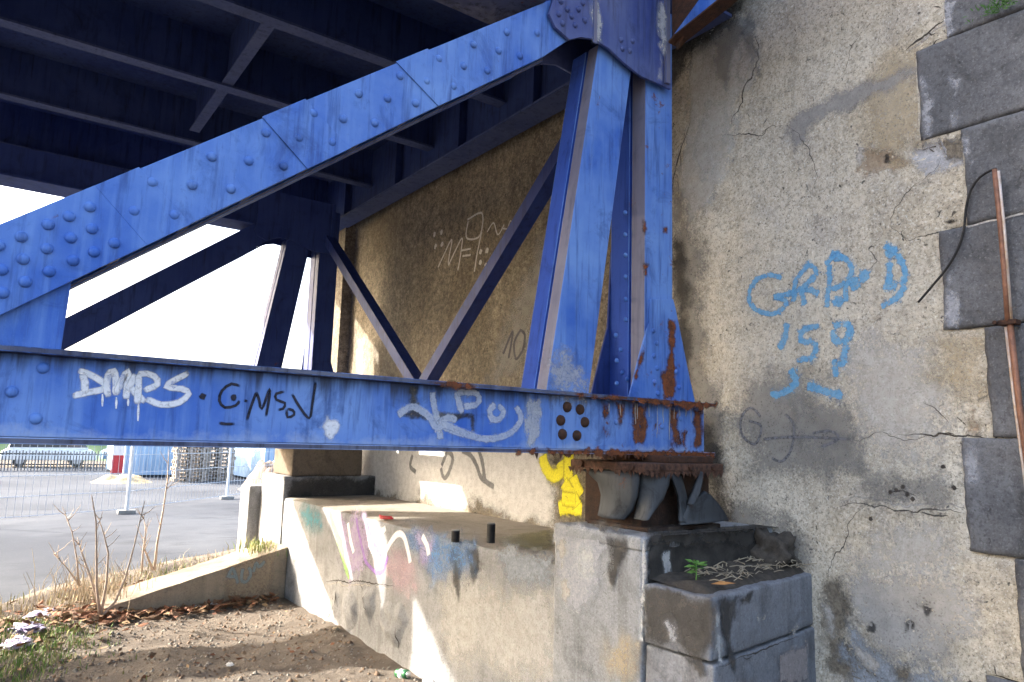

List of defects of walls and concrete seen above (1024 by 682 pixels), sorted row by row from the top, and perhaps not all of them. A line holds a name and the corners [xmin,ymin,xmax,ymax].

crack [724,125,818,190]
corrosion [435,381,475,390]
corrosion [516,319,723,479]
crack [841,402,997,441]
crack [827,490,965,581]
crack [326,580,395,618]